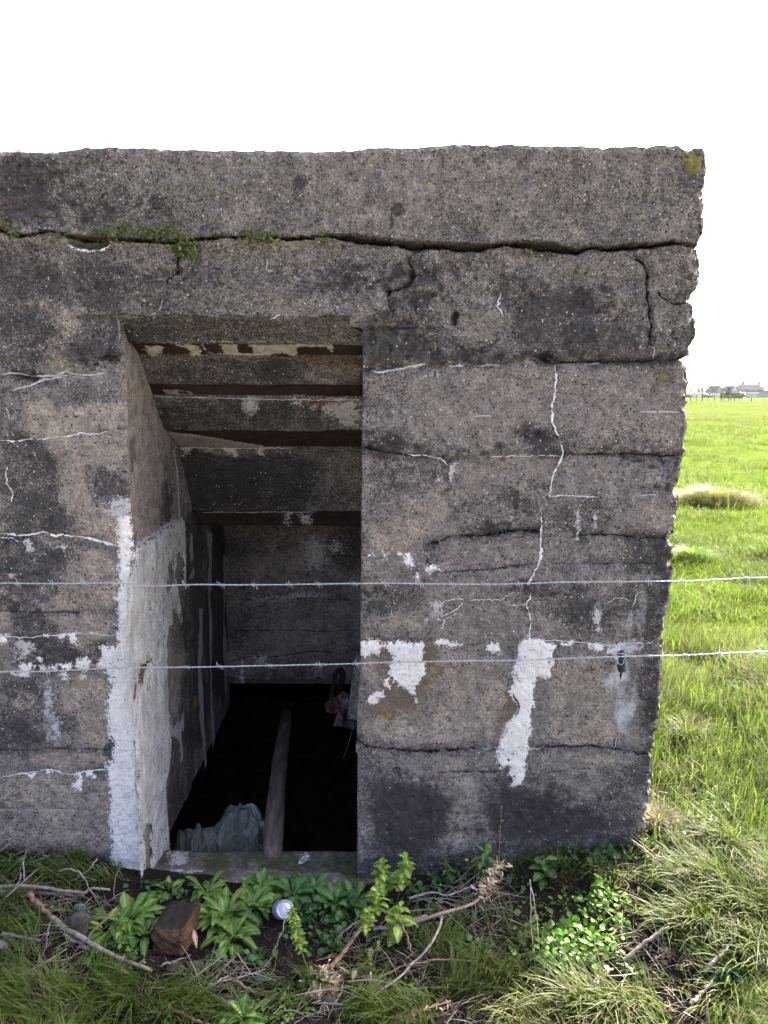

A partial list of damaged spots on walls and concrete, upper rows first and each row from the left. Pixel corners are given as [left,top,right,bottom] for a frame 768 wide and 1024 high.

crack [0,230,699,646]
leakage [360,635,612,871]